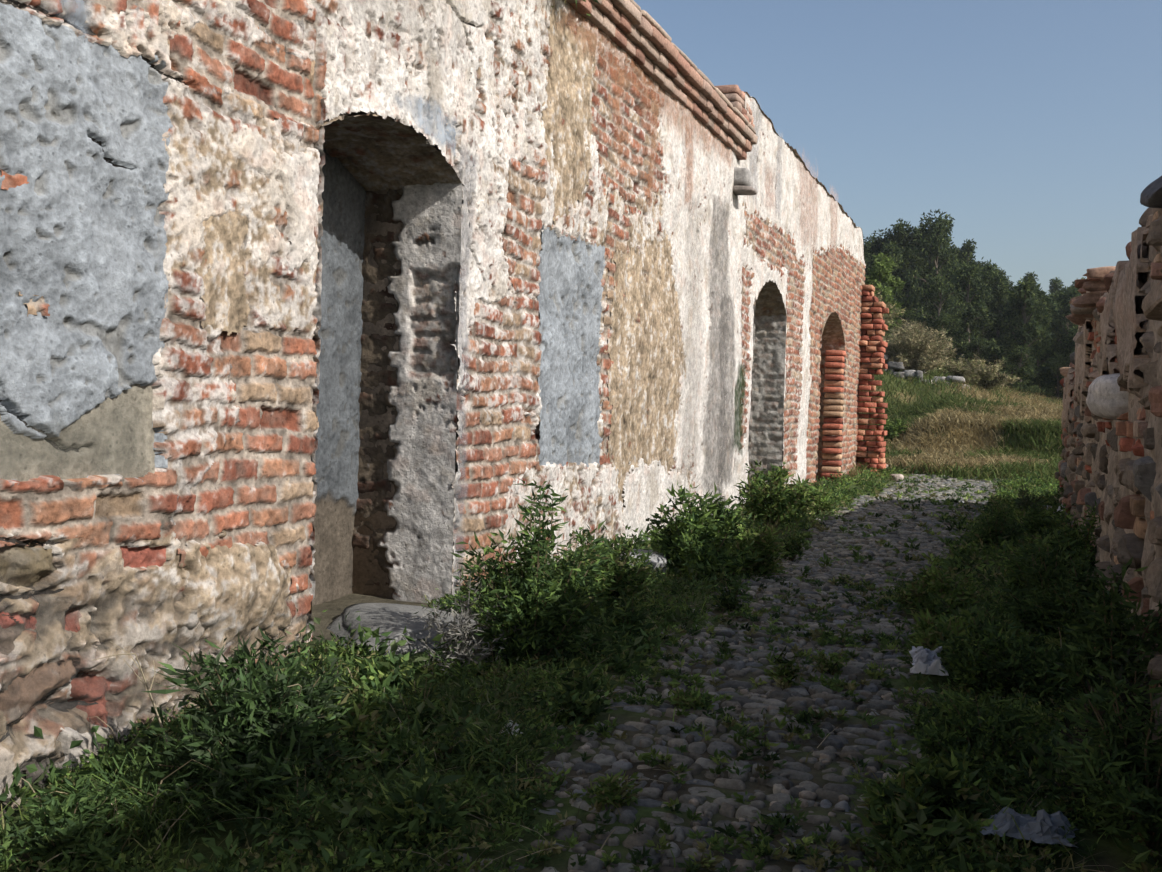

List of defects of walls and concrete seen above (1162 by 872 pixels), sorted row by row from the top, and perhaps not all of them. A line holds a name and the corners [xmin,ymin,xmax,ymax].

crack [0,0,97,35]
spalling [103,0,160,25]
crack [141,55,187,85]
spalling [167,0,330,129]
spalling [453,0,689,595]
spalling [738,202,866,485]
spalling [55,669,112,772]